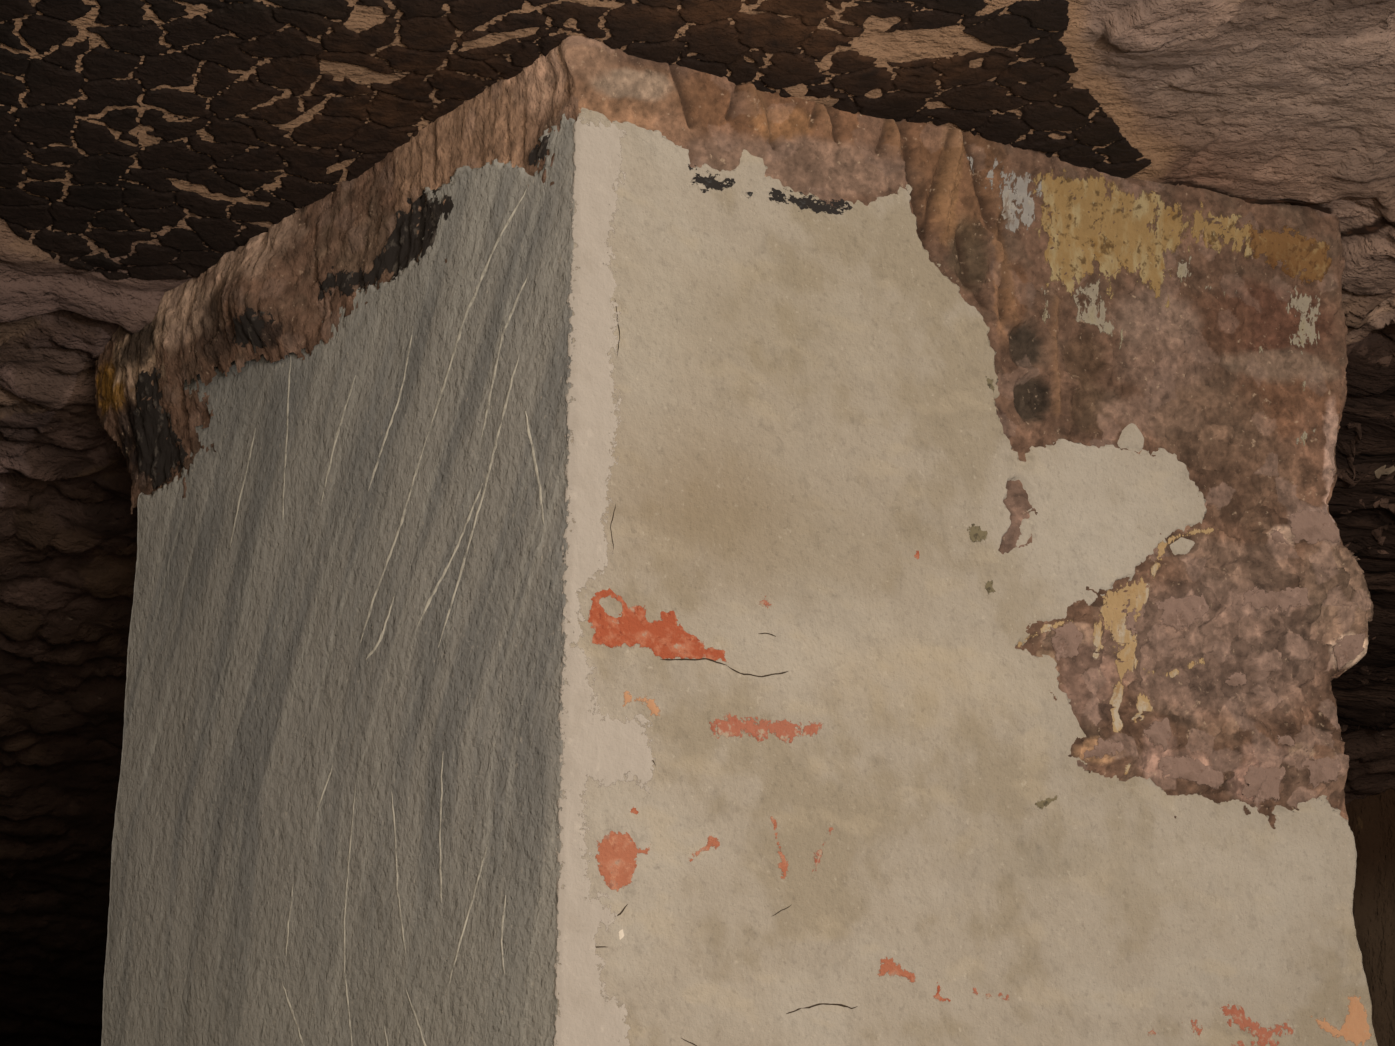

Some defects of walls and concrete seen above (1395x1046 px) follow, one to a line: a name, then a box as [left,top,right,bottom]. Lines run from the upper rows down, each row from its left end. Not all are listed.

leakage [318,188,454,301]
leakage [528,134,550,166]
leakage [688,164,853,215]
leakage [232,307,276,356]
leakage [133,367,188,490]
leakage [230,431,255,546]
leakage [282,356,291,518]
leakage [320,375,356,506]
leakage [360,190,527,660]
leakage [525,411,544,523]
spalling [998,480,1038,554]
spalling [1015,468,1373,829]